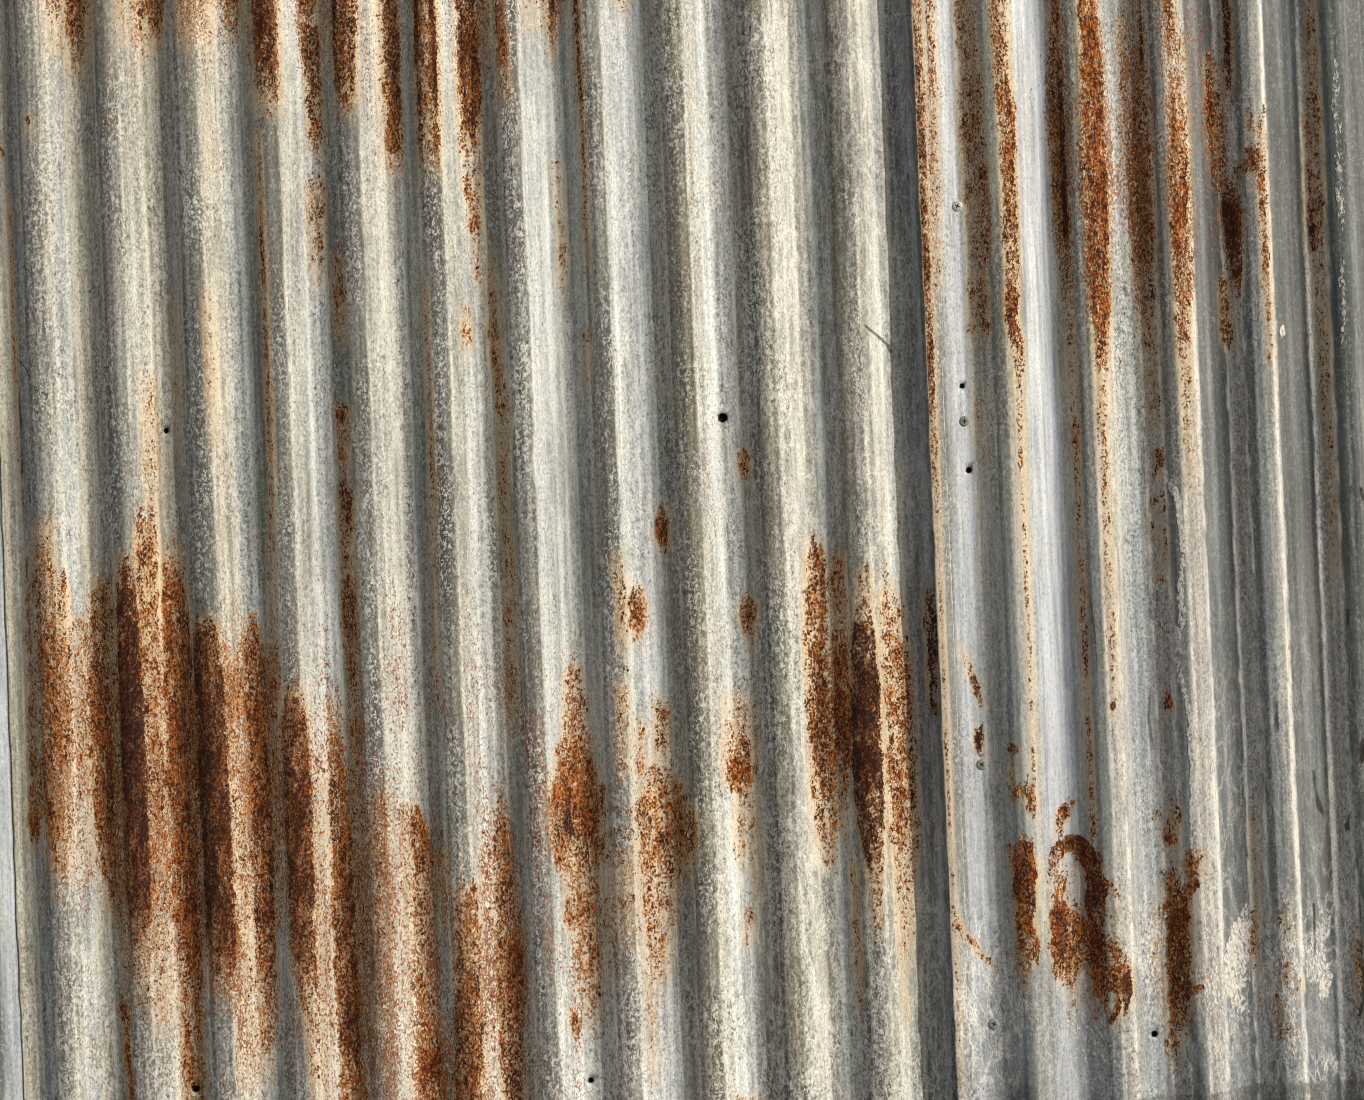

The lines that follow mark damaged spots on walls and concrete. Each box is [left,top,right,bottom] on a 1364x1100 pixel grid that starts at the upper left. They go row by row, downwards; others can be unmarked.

corrosion [524,0,588,295]
corrosion [1204,0,1273,361]
corrosion [20,0,526,1100]
corrosion [613,555,648,649]
corrosion [655,504,670,557]
corrosion [740,586,757,651]
corrosion [801,0,952,1016]
corrosion [951,0,1195,1032]
corrosion [539,651,699,1097]
corrosion [721,669,762,884]
corrosion [1148,791,1210,1076]
corrosion [1250,858,1301,1042]